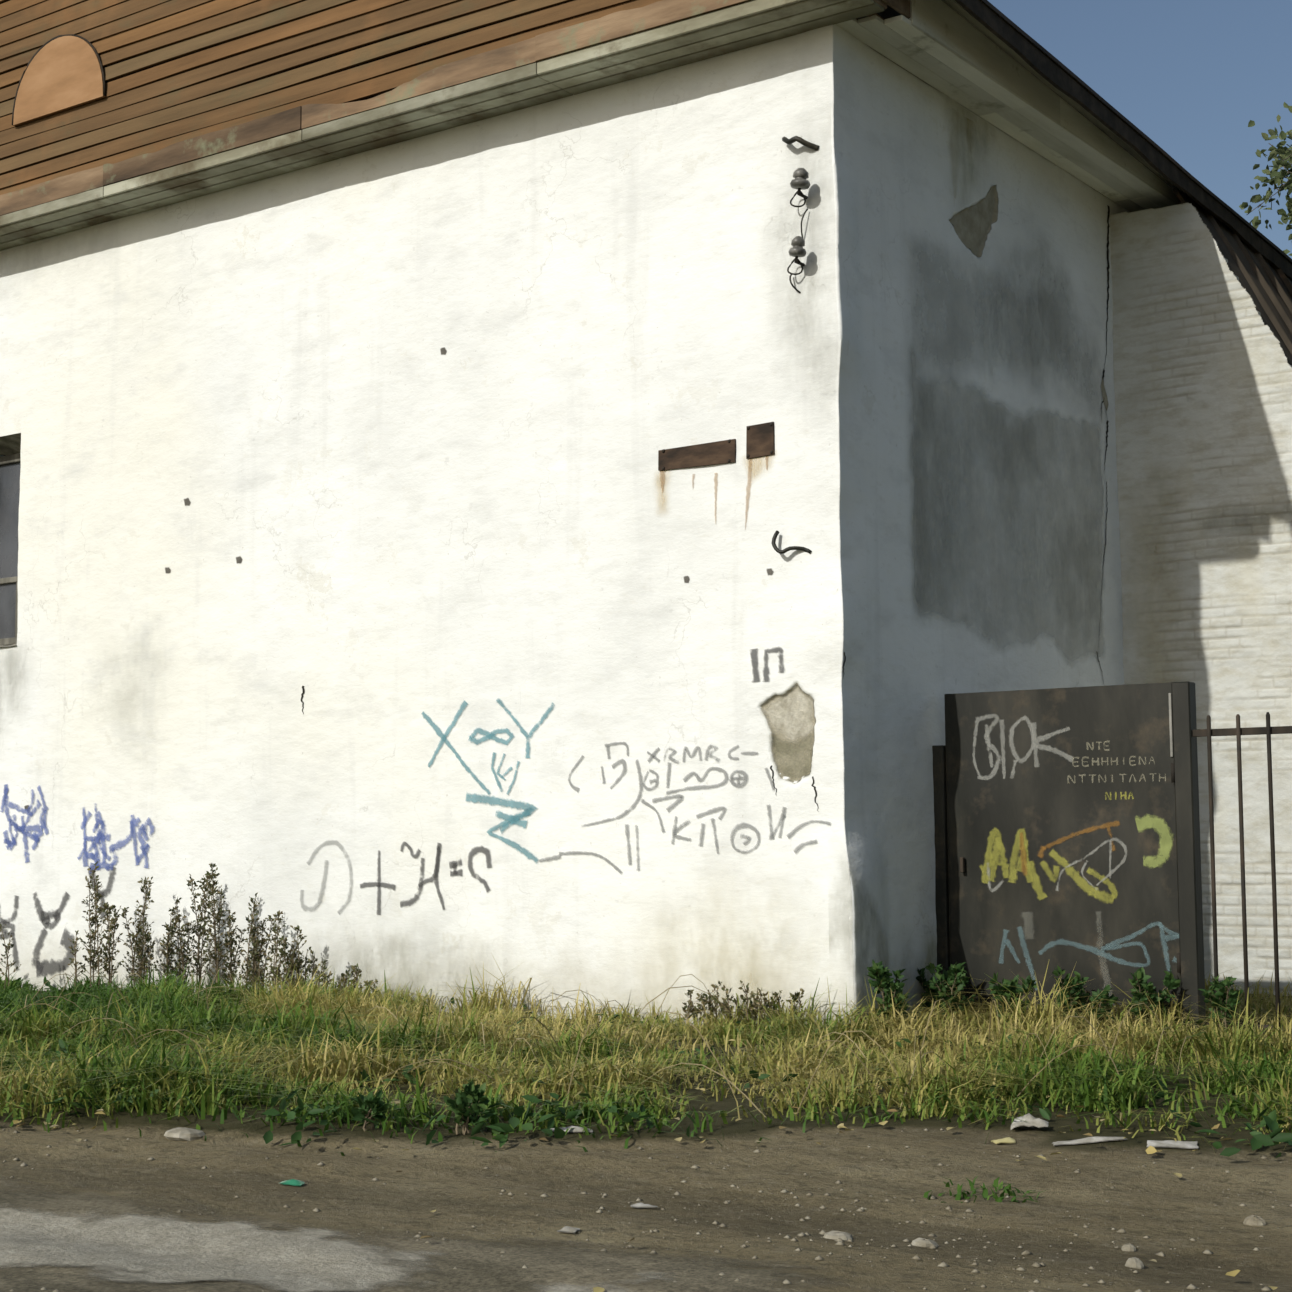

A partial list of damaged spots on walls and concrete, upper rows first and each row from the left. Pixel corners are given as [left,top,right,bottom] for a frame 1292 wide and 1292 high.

flaking render [949,185,998,257]
crack [1096,205,1110,683]
flaking render [761,684,816,782]